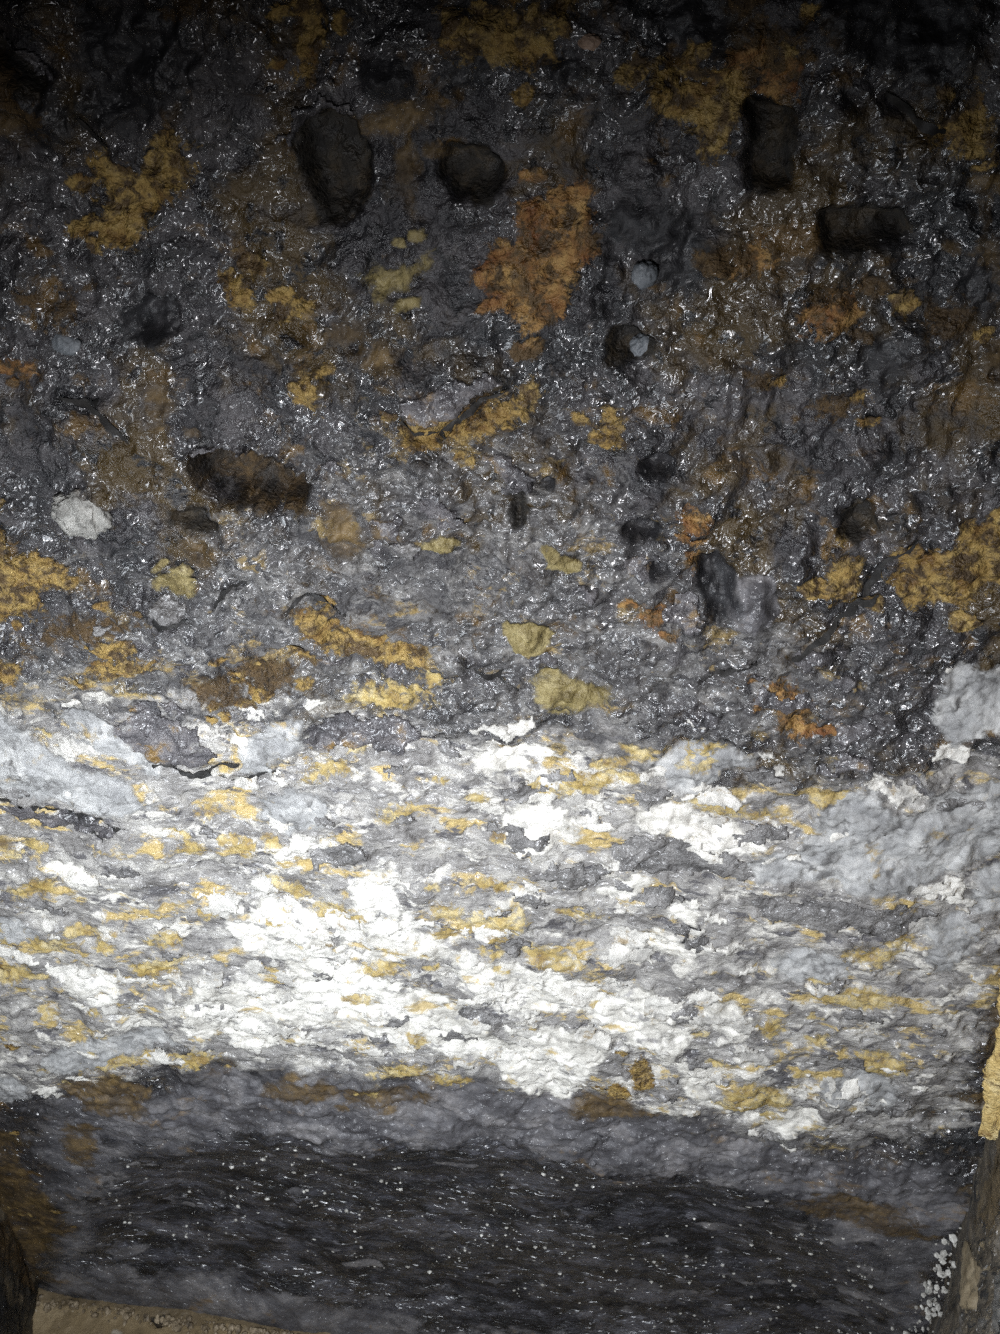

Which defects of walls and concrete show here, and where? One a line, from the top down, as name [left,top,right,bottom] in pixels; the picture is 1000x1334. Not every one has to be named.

rust [613,36,804,167]
rust [62,130,200,256]
rust [366,230,431,313]
rust [379,167,601,468]
peeling [182,445,217,460]
peeling [398,372,503,429]
rust [0,531,156,690]
peeling [92,624,113,637]
peeling [147,593,187,626]
peeling [381,542,422,562]
rust [796,507,1000,633]
leakage [0,402,1000,1236]